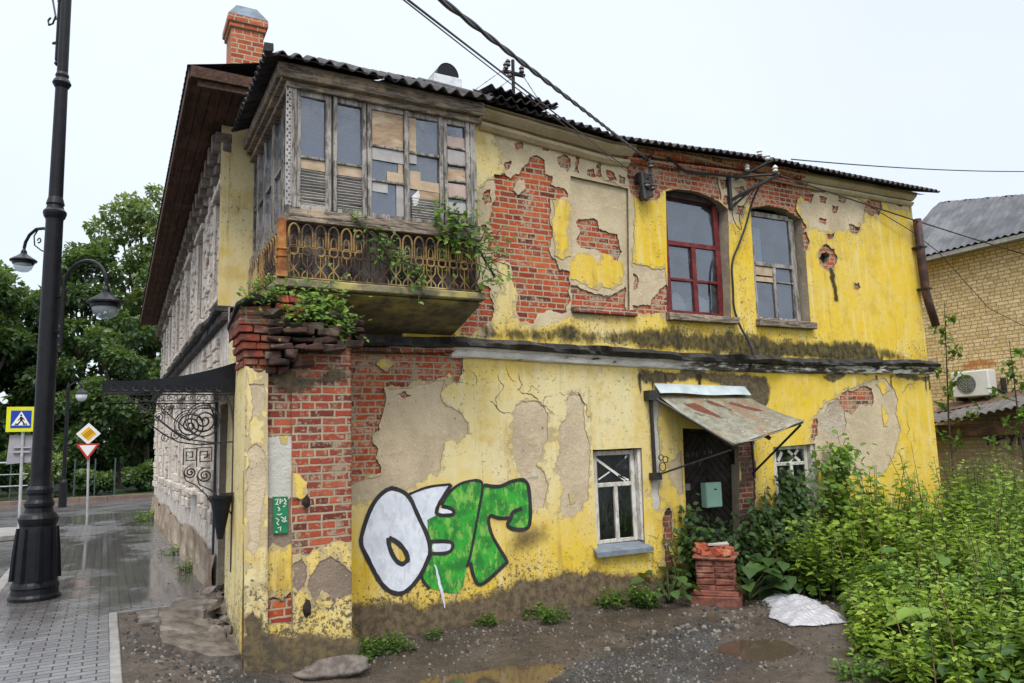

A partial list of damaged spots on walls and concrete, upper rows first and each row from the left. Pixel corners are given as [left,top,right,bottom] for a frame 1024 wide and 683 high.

flaking render [461,134,910,337]
leakage [829,267,839,301]
flaking render [245,333,468,624]
crack [474,369,588,417]
peeling [512,394,591,519]
leakage [638,369,770,406]
rust [685,400,763,418]
peeling [805,378,900,475]
leakage [240,569,679,672]